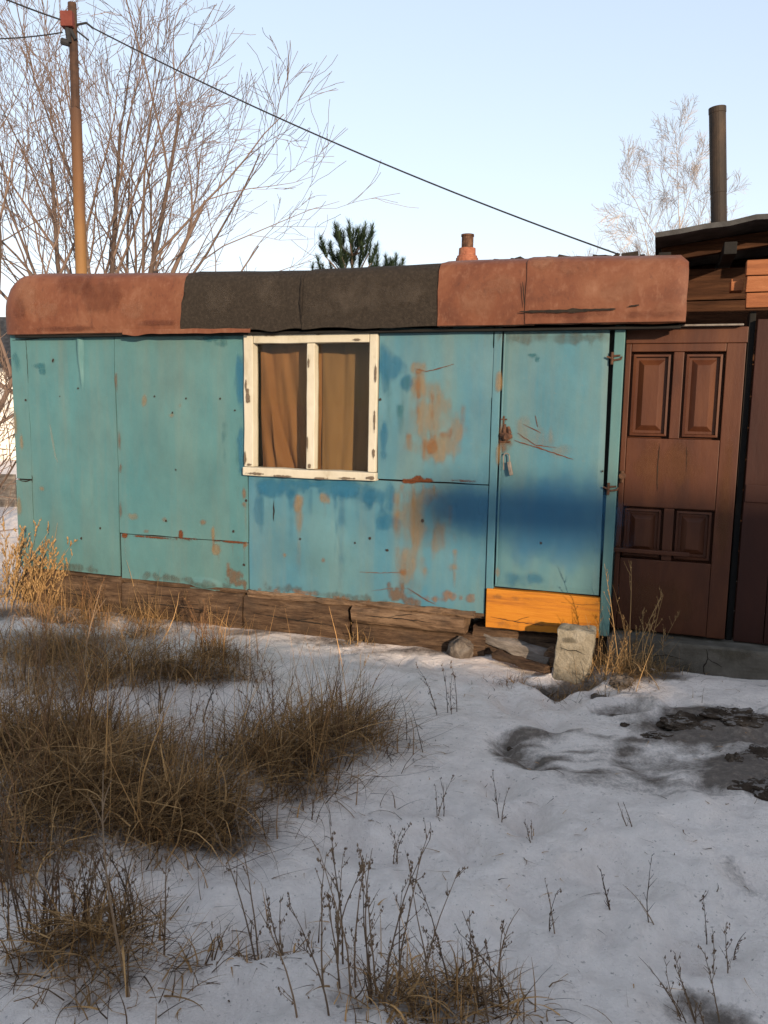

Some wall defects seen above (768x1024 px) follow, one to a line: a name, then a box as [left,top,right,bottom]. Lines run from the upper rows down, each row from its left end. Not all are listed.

corrosion [402,475,433,484]
corrosion [122,530,195,540]
corrosion [388,571,418,606]